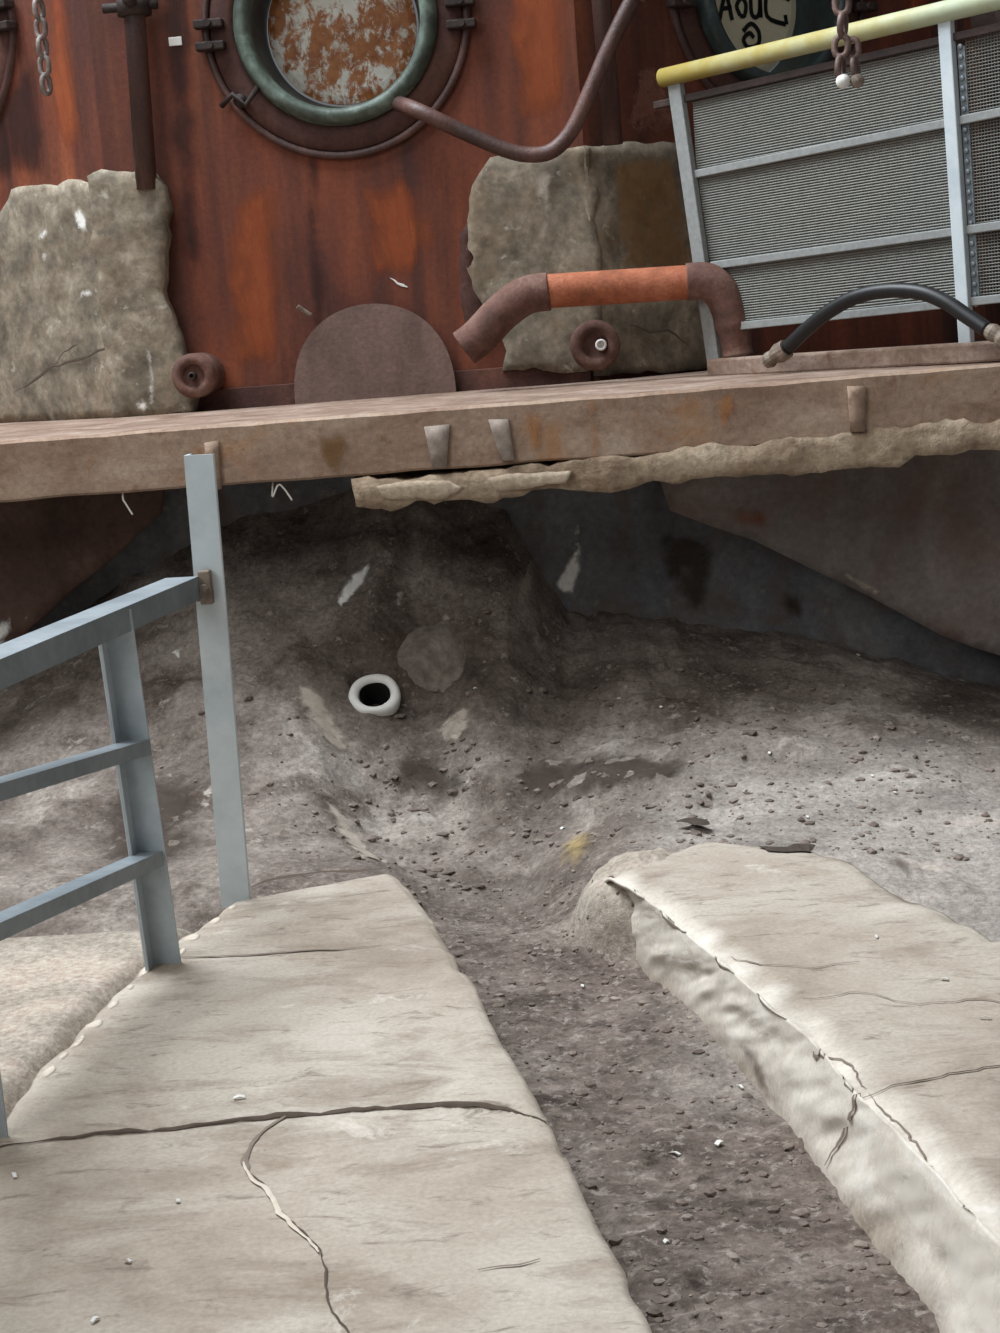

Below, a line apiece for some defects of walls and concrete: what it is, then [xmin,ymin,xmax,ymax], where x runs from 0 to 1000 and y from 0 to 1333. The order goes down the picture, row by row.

crack [731,956,1000,1004]
crack [813,1053,1000,1167]
crack [0,1101,547,1333]